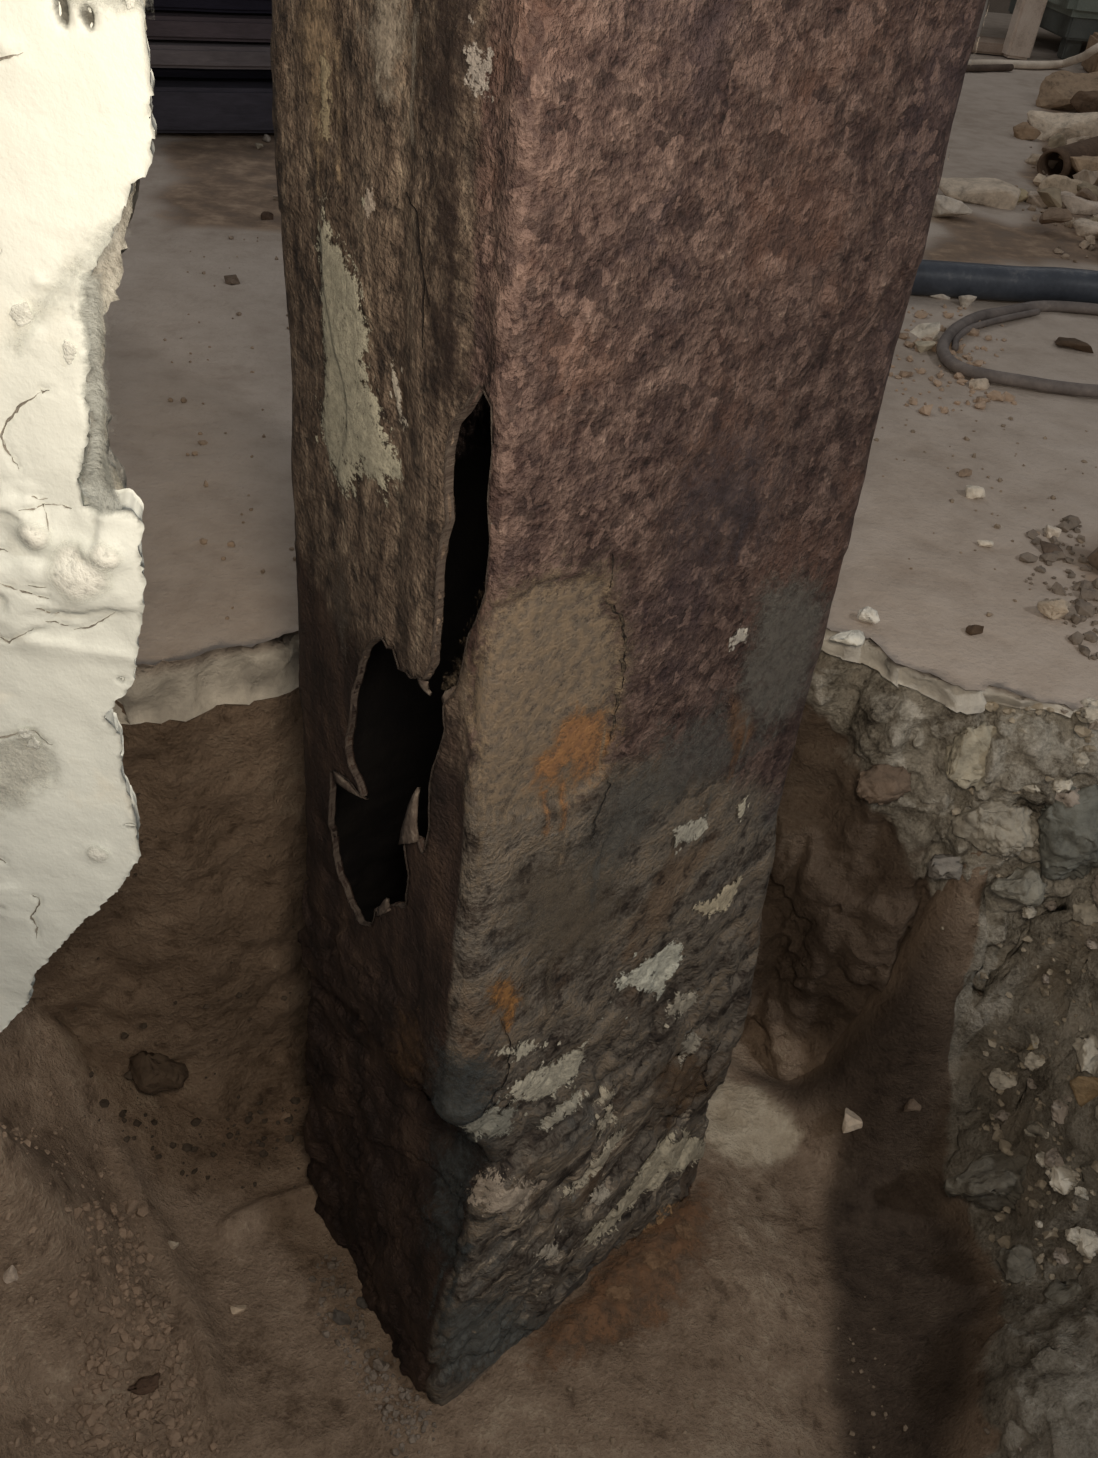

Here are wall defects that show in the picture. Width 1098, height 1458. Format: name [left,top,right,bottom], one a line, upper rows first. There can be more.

crack [0,390,72,531]
crack [0,548,116,644]
peeling [417,678,456,705]
peeling [332,769,369,800]
corrosion [535,710,610,835]
peeling [399,787,421,845]
crack [30,894,40,940]
peeling [376,897,392,917]
corrosion [492,981,521,1030]